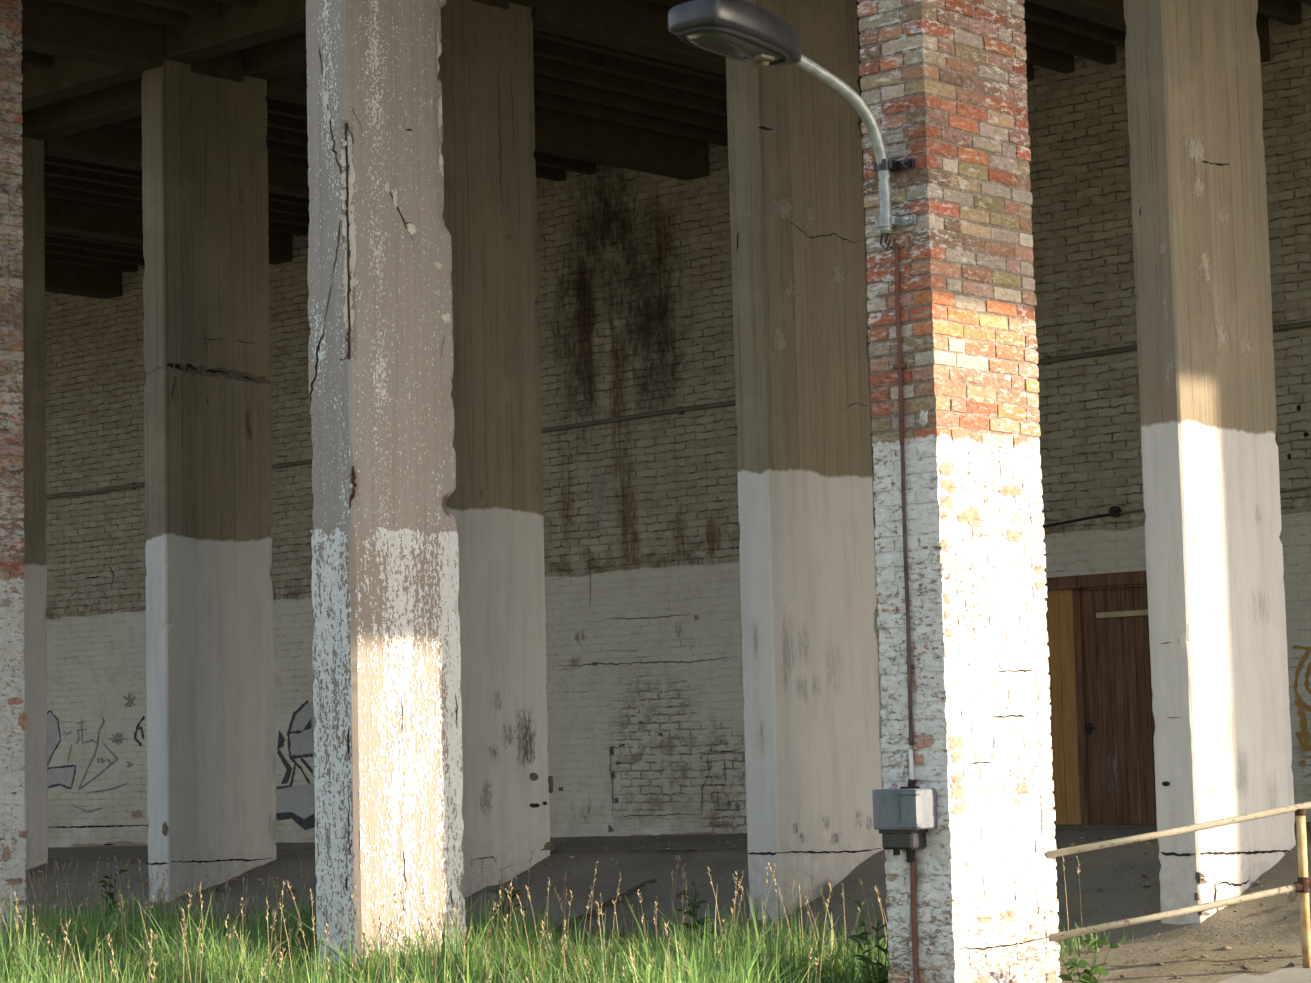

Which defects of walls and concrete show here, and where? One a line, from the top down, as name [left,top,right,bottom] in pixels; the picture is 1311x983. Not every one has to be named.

crack [308,50,363,416]
crack [390,192,413,239]
crack [782,219,865,243]
crack [146,329,272,402]
peeling [306,0,466,974]
peeling [939,462,987,539]
peeling [1000,485,1023,497]
peeling [1005,529,1023,543]
peeling [7,697,28,730]
peeling [913,735,964,816]
peeling [2,830,28,885]
peeling [976,910,1017,924]